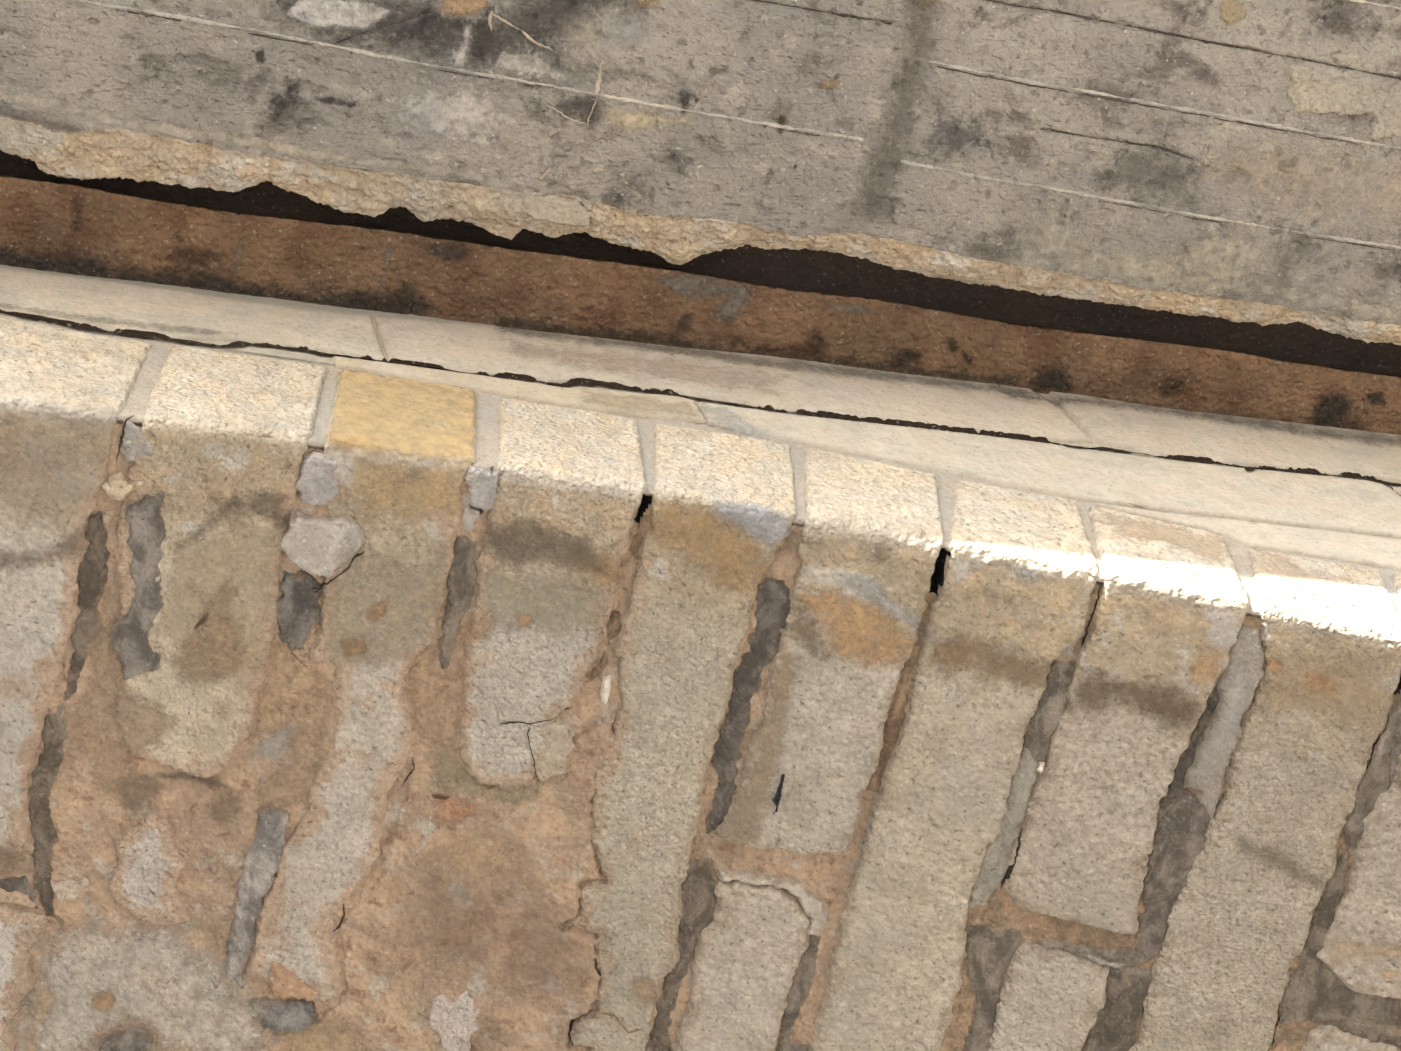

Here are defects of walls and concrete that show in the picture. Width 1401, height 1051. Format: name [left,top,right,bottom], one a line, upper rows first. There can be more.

damp [857,0,930,213]
spalling [0,116,1401,345]
crack [0,309,1401,496]
crack [501,707,572,783]